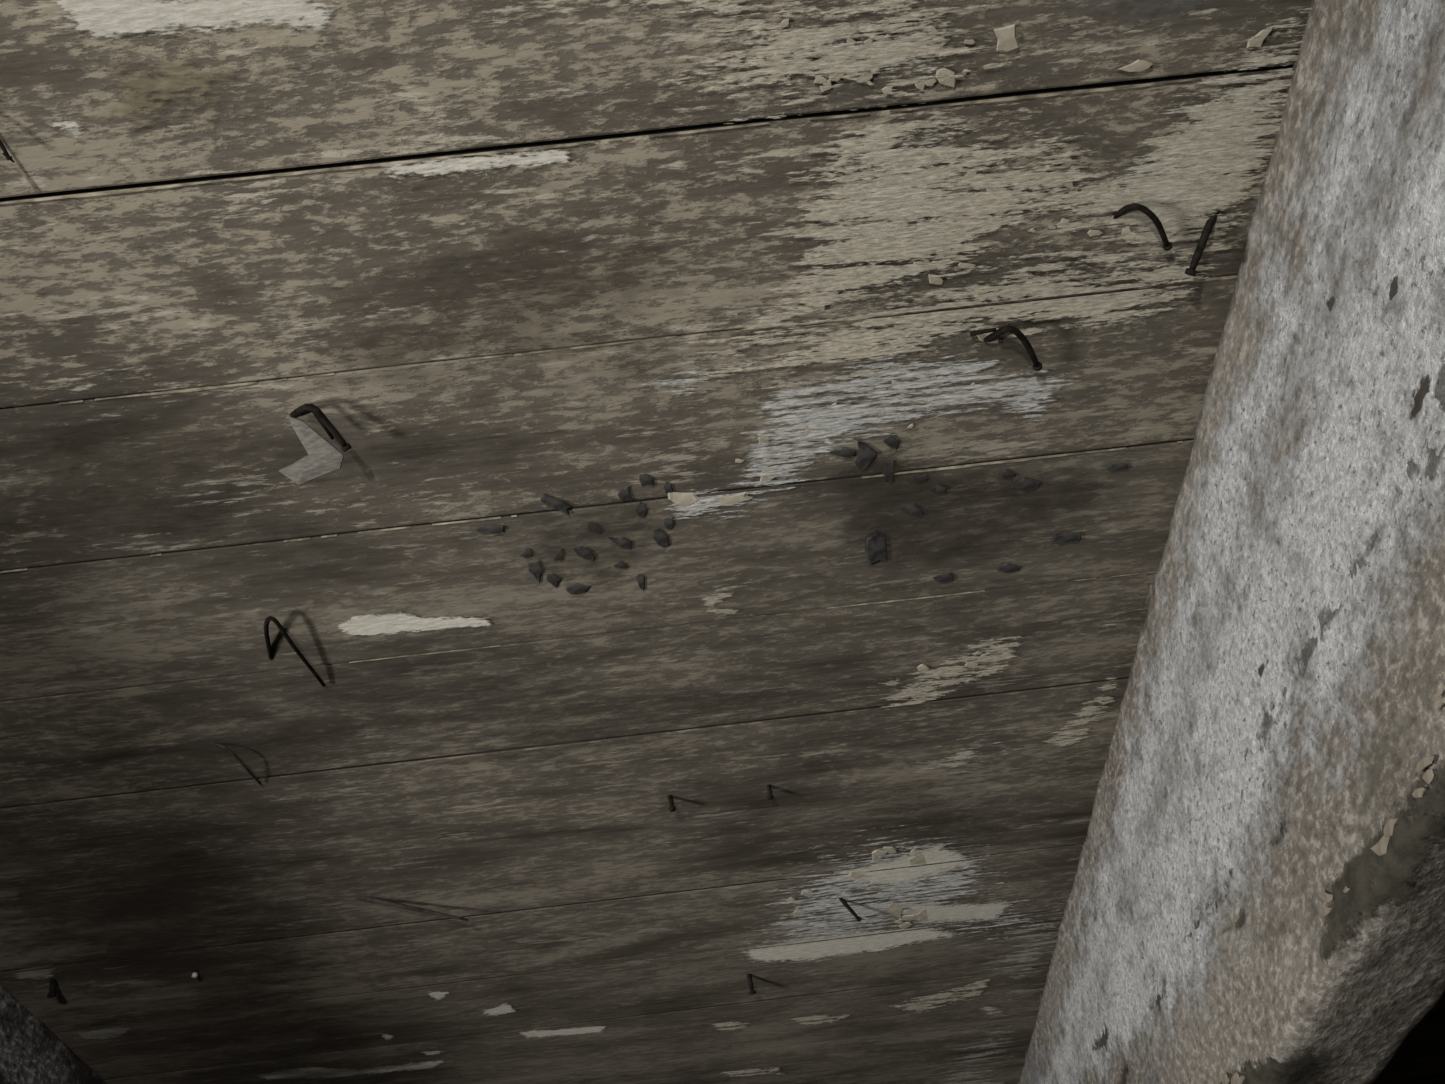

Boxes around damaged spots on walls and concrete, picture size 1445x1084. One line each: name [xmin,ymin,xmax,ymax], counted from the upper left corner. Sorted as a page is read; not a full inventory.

leakage [1026,0,1445,1084]